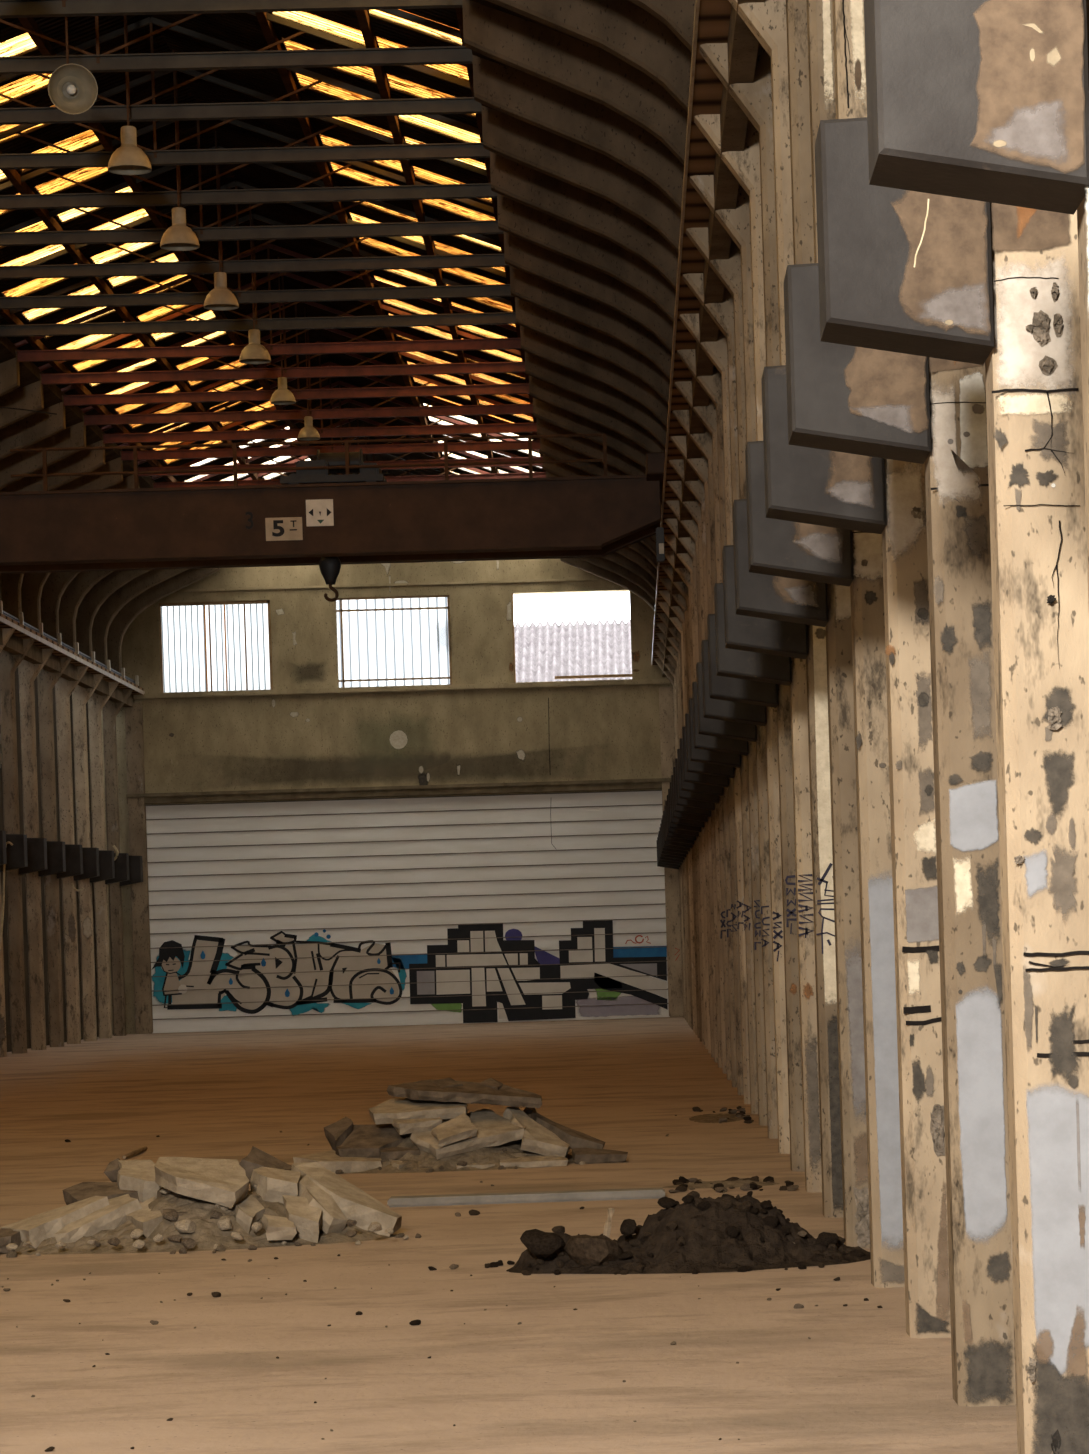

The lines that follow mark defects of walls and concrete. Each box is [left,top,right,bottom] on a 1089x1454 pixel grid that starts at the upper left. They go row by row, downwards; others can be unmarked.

peeling [970,0,1085,173]
peeling [892,190,1070,334]
peeling [844,346,984,433]
peeling [827,451,874,505]
leakage [1024,687,1077,918]
leakage [915,1185,1013,1403]
leakage [1032,1308,1089,1454]